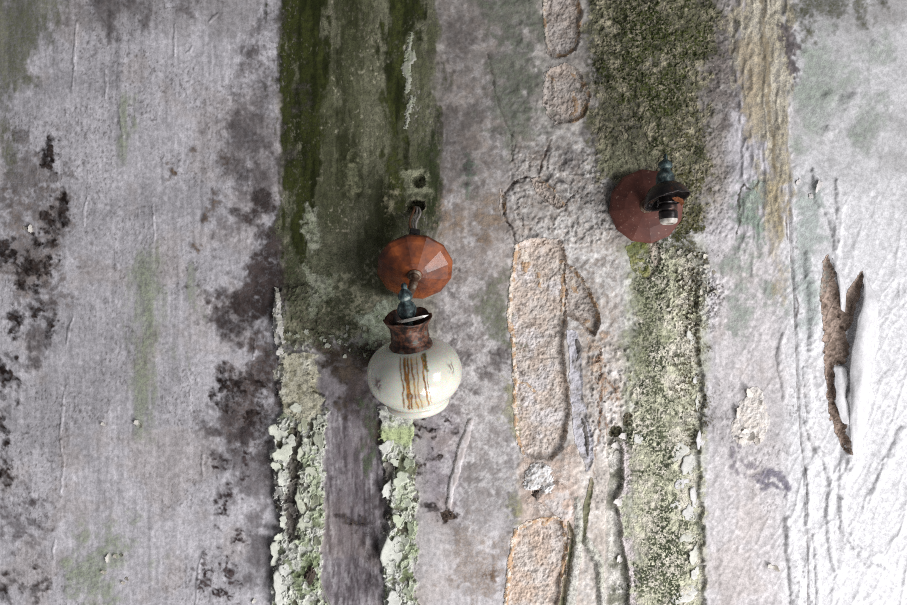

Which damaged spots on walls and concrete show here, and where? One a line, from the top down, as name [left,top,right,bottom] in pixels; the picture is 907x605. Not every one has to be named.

leakage [0,415,17,489]
leakage [0,353,22,401]
leakage [0,135,72,369]
leakage [193,0,400,604]
peeling [268,392,331,605]
peeling [272,287,351,358]
peeling [377,405,420,605]
leakage [334,0,474,247]
crack [504,139,552,194]
peeling [731,387,771,447]